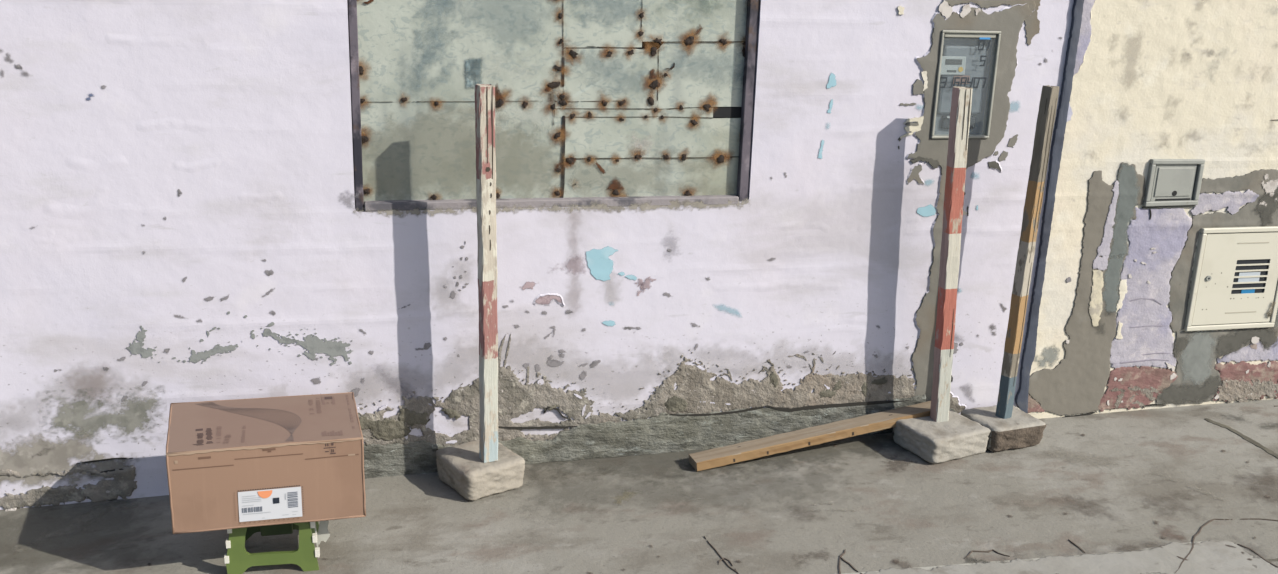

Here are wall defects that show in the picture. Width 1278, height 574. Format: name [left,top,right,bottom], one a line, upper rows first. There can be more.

rust [495,85,509,107]
rust [544,39,627,142]
rust [602,12,669,121]
rust [555,156,626,197]
peeling [988,134,1018,173]
peeling [257,311,366,384]
peeling [498,325,917,441]
peeling [351,378,480,447]
peeling [0,465,137,512]
crack [704,536,739,574]
crack [839,549,862,574]
crack [1175,518,1278,573]